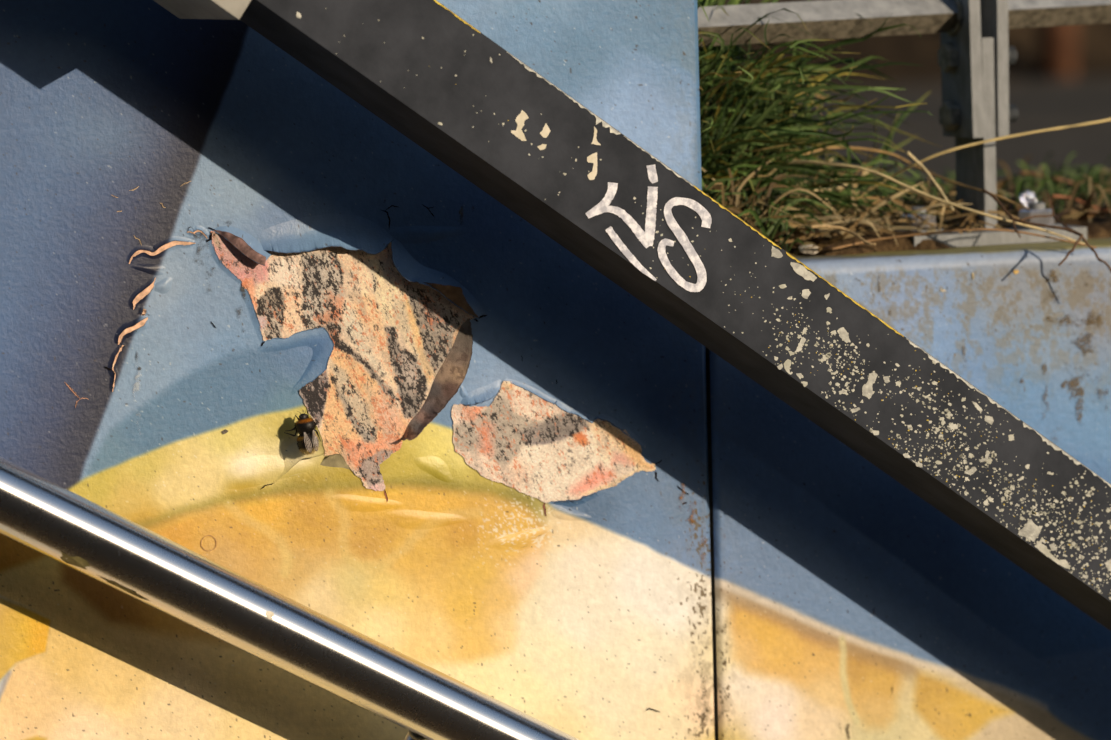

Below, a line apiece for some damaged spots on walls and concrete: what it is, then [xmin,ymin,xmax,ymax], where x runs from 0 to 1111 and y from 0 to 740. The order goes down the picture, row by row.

spalling [490,51,694,186]
peeling [208,214,656,507]
spalling [723,245,1111,600]